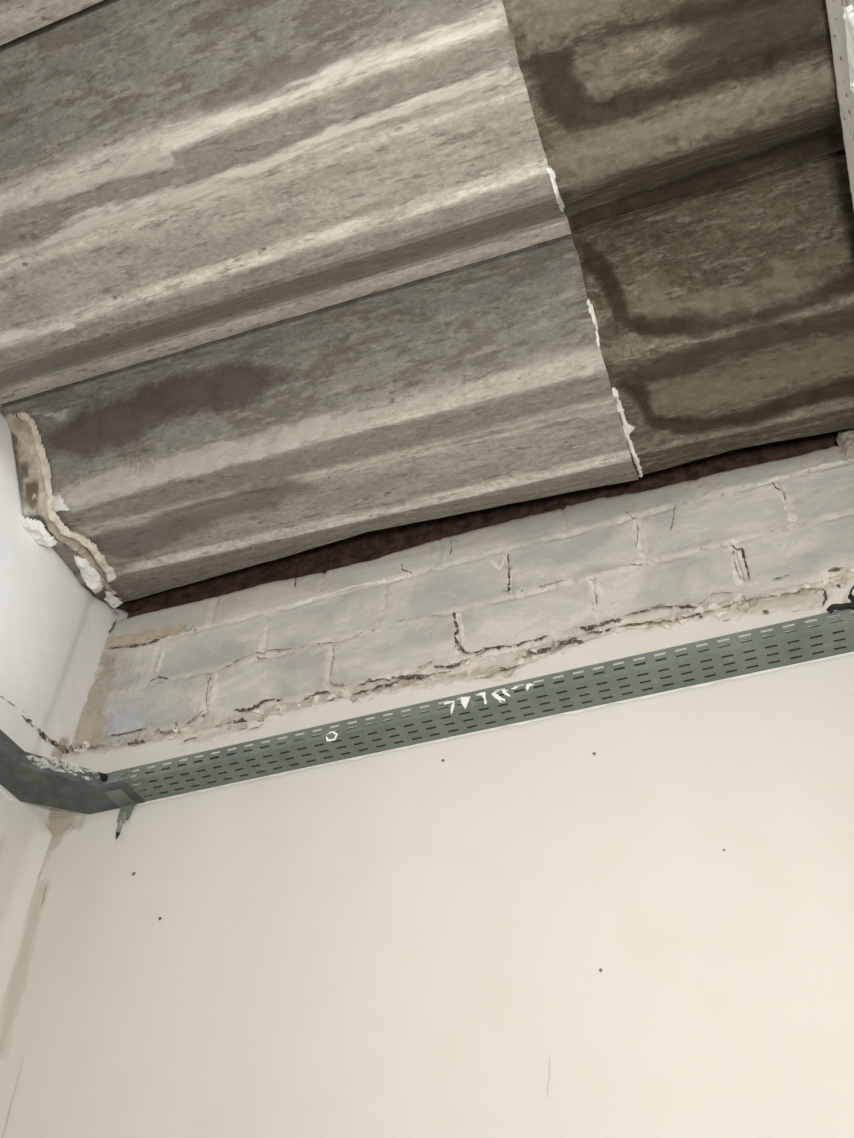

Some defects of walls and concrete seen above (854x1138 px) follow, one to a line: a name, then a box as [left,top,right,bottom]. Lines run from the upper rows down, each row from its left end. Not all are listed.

leakage [0,0,838,249]
peeling [834,0,854,140]
leakage [584,244,854,434]
leakage [63,393,445,512]
crack [199,632,363,714]
crack [399,612,464,649]
crack [503,554,613,604]
crack [730,543,750,581]